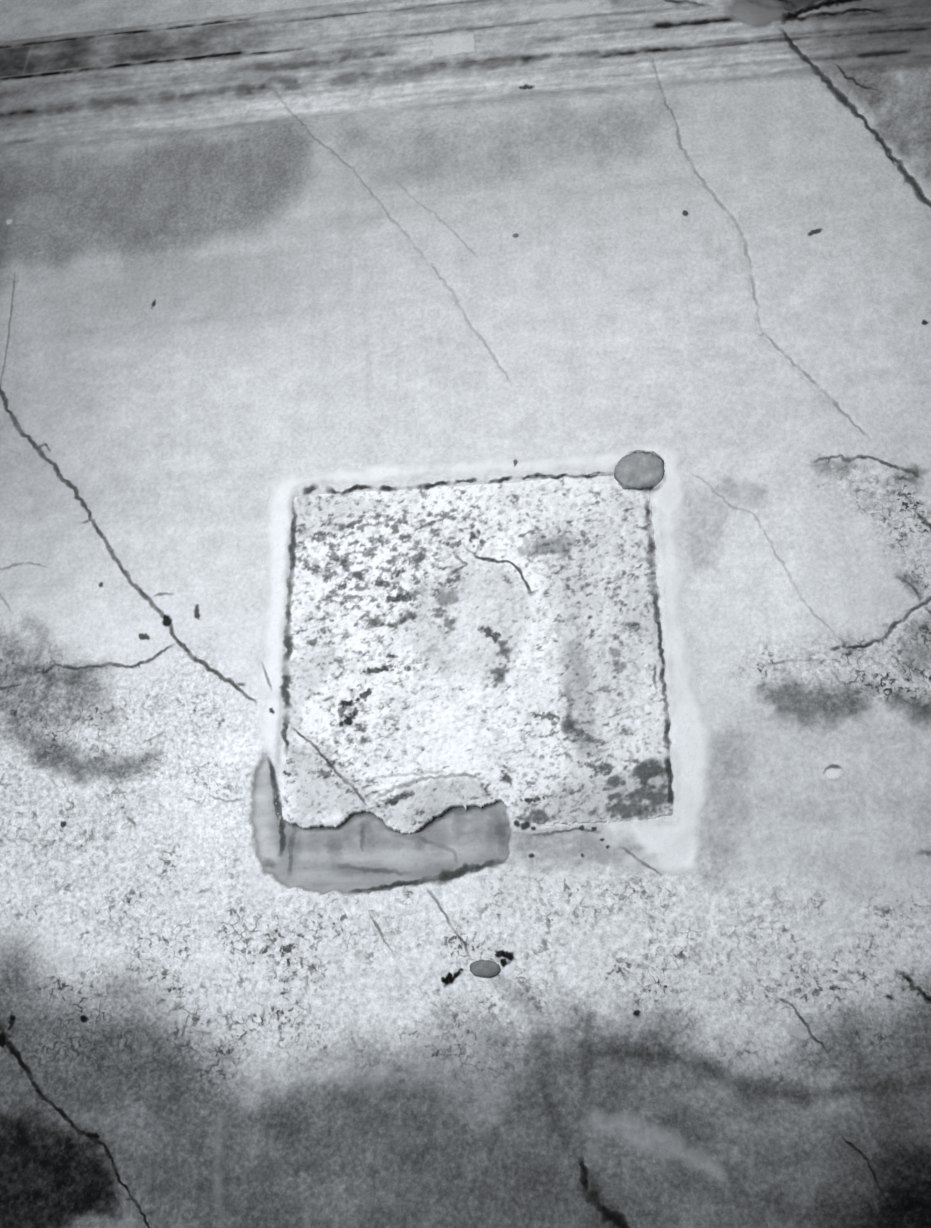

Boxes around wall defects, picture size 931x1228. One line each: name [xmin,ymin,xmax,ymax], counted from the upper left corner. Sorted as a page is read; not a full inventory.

crack [780,0,931,207]
flaking render [856,455,928,541]
crack [0,389,266,700]
flaking render [851,652,931,699]
flaking render [826,765,841,779]
flaking render [250,753,671,895]
flaking render [39,976,100,1022]
flaking render [35,1035,136,1070]
flaking render [200,979,299,1079]
crack [902,974,931,1002]
crack [0,1014,150,1228]
crack [579,1160,628,1228]